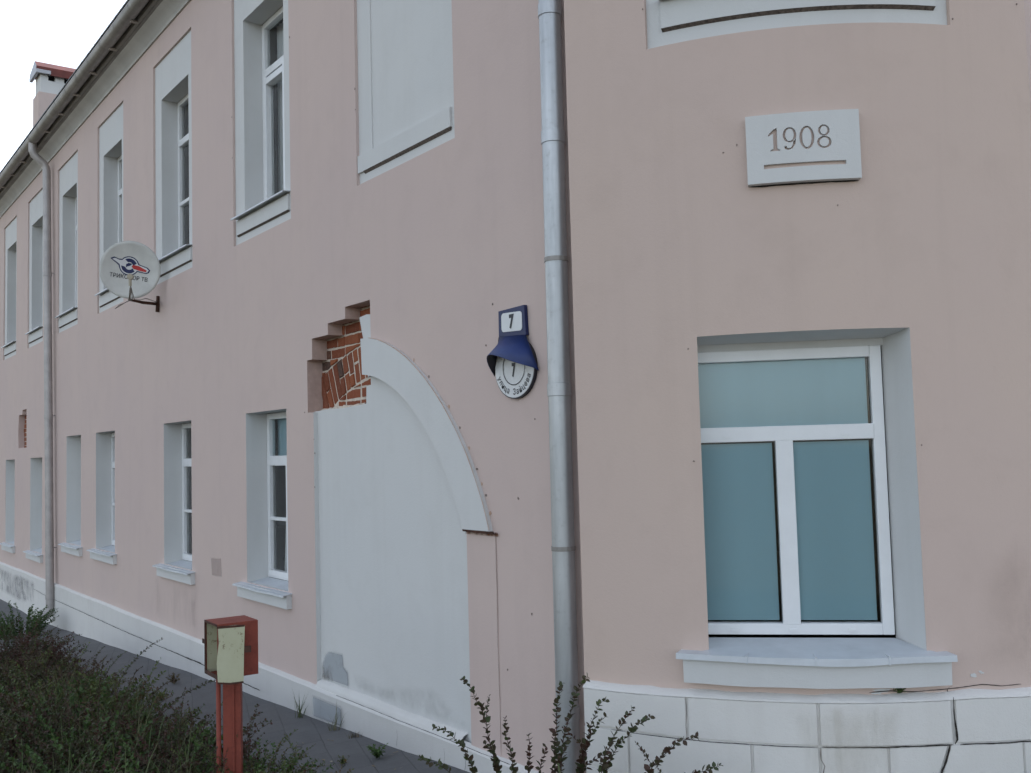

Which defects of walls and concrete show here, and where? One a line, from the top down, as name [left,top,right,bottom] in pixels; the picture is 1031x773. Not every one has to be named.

flaking render [321,305,494,534]
crack [611,684,1031,773]